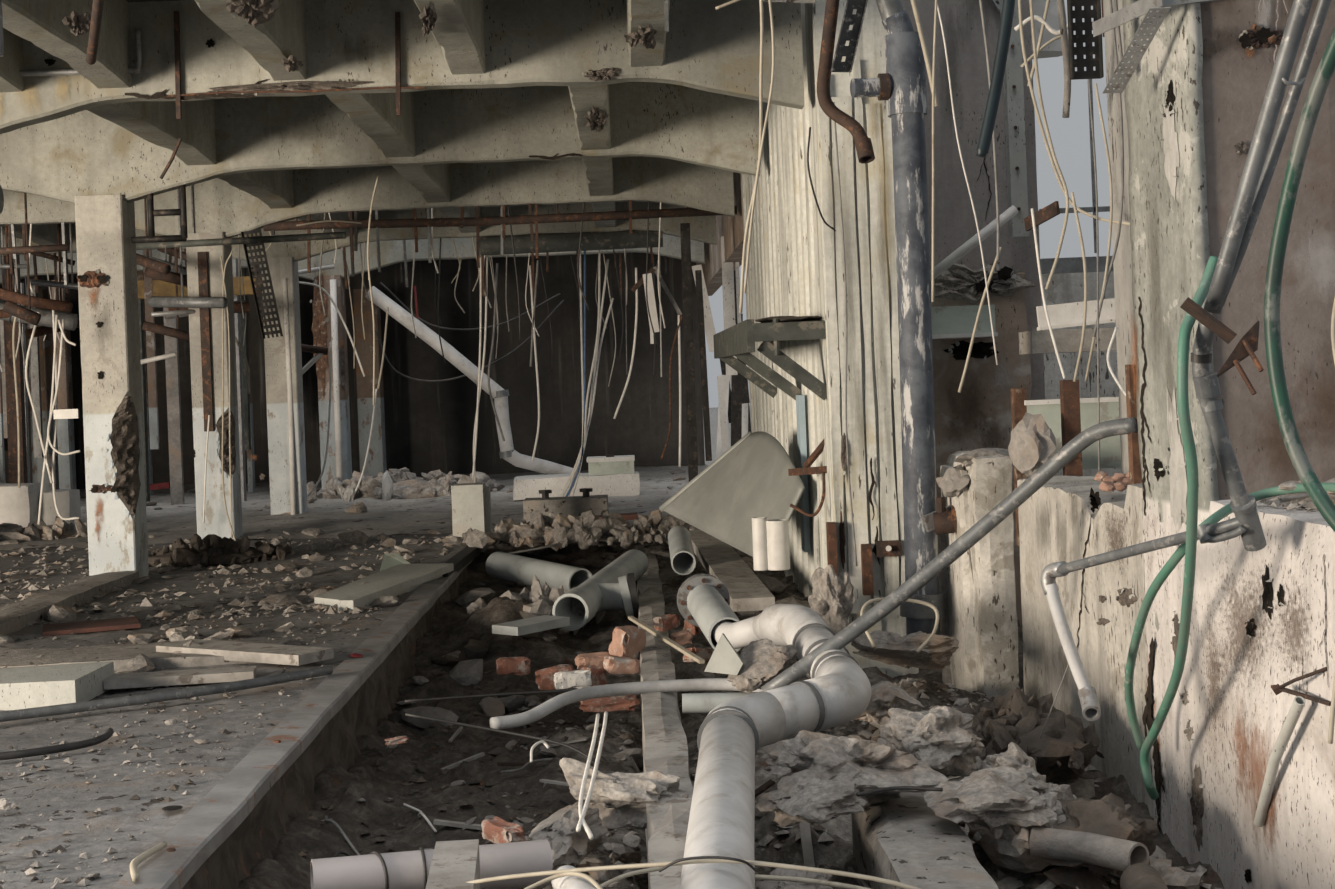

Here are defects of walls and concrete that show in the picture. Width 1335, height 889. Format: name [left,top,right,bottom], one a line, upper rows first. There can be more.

spalling [225,0,279,27]
spalling [1239,23,1283,56]
spalling [90,396,141,517]
spalling [197,252,236,478]
crack [1138,297,1152,516]